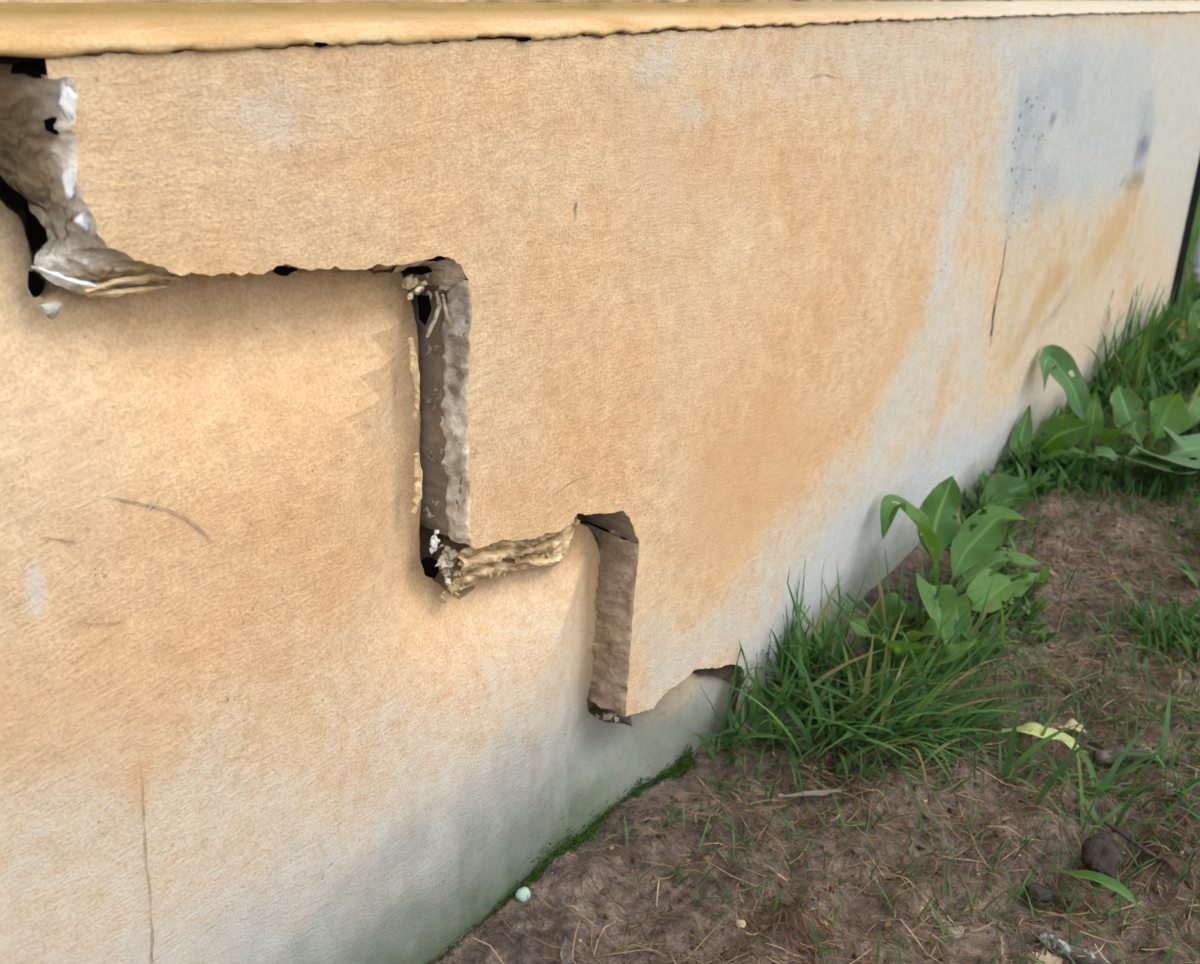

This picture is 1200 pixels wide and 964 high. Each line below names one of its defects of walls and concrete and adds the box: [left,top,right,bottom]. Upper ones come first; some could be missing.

crack [0,51,139,64]
crack [256,41,388,49]
crack [419,36,532,44]
water stain [145,48,397,182]
crack [990,221,1011,347]
water stain [522,13,1200,804]
crack [169,256,642,723]
crack [40,536,78,544]
crack [99,496,218,547]
crack [693,664,745,714]
crack [139,756,154,964]